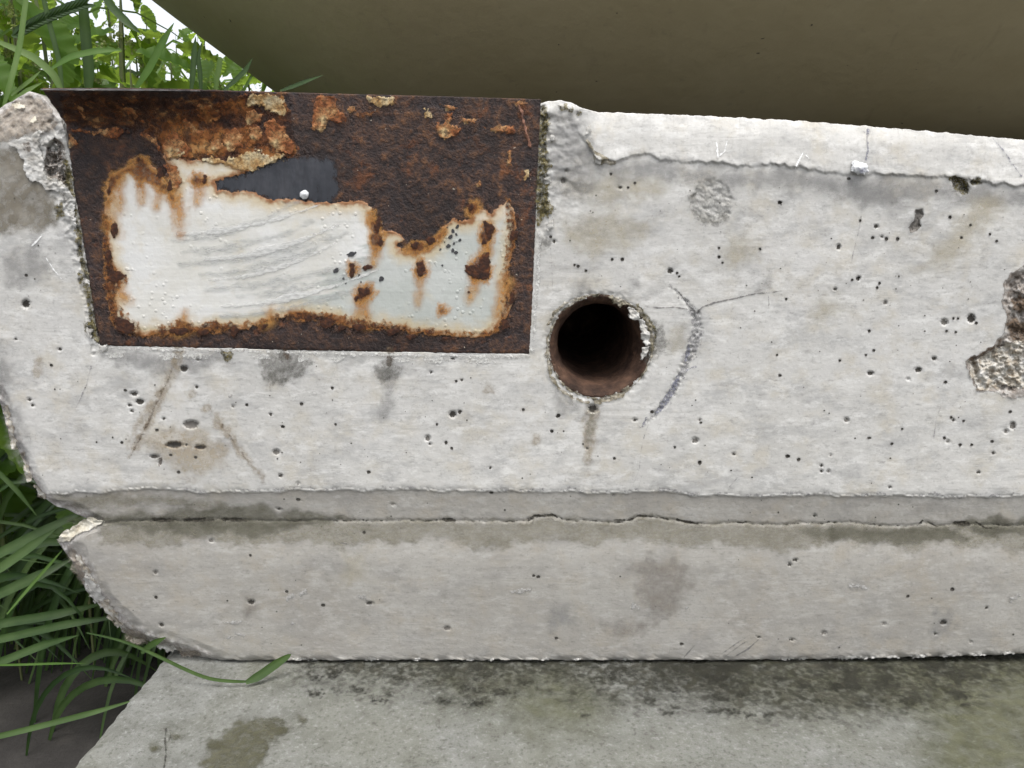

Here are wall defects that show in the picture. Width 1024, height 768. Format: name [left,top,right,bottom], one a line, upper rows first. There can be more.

peeling [0,92,339,212]
corrosion [102,156,519,366]
spalling [966,266,1024,398]
spalling [3,405,46,499]
crack [135,515,307,523]
crack [411,514,699,524]
crack [873,520,1018,529]
spalling [57,517,200,657]
damp [306,668,387,703]
damp [654,660,751,718]